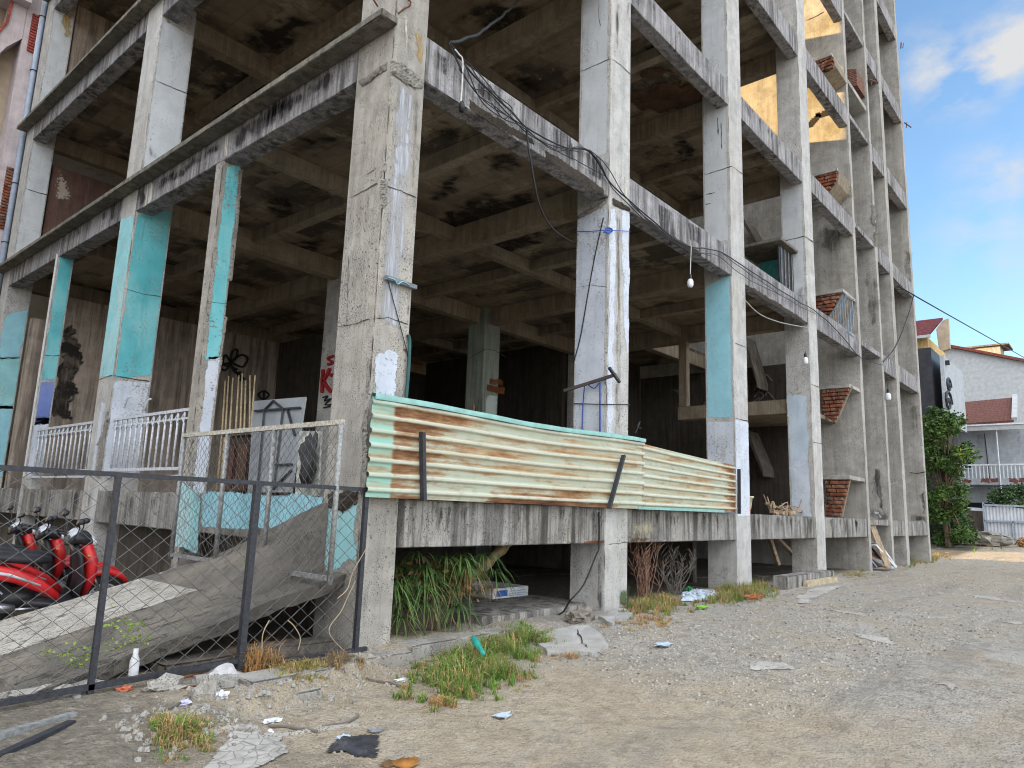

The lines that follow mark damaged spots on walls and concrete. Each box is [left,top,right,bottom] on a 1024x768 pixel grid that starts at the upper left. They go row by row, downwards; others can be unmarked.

water stain [242,17,311,49]
water stain [139,73,330,206]
spalling [228,169,243,281]
water stain [440,194,534,227]
water stain [494,232,542,251]